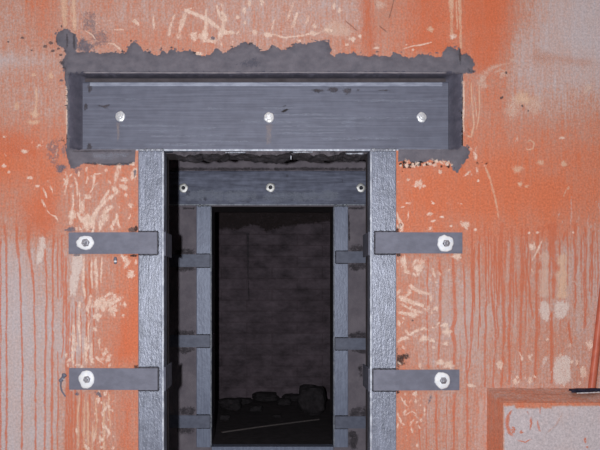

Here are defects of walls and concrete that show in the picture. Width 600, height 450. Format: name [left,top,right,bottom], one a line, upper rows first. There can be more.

spalling [173,151,368,164]
flaking render [399,158,451,174]
peeling [64,254,127,368]
peeling [75,390,115,450]